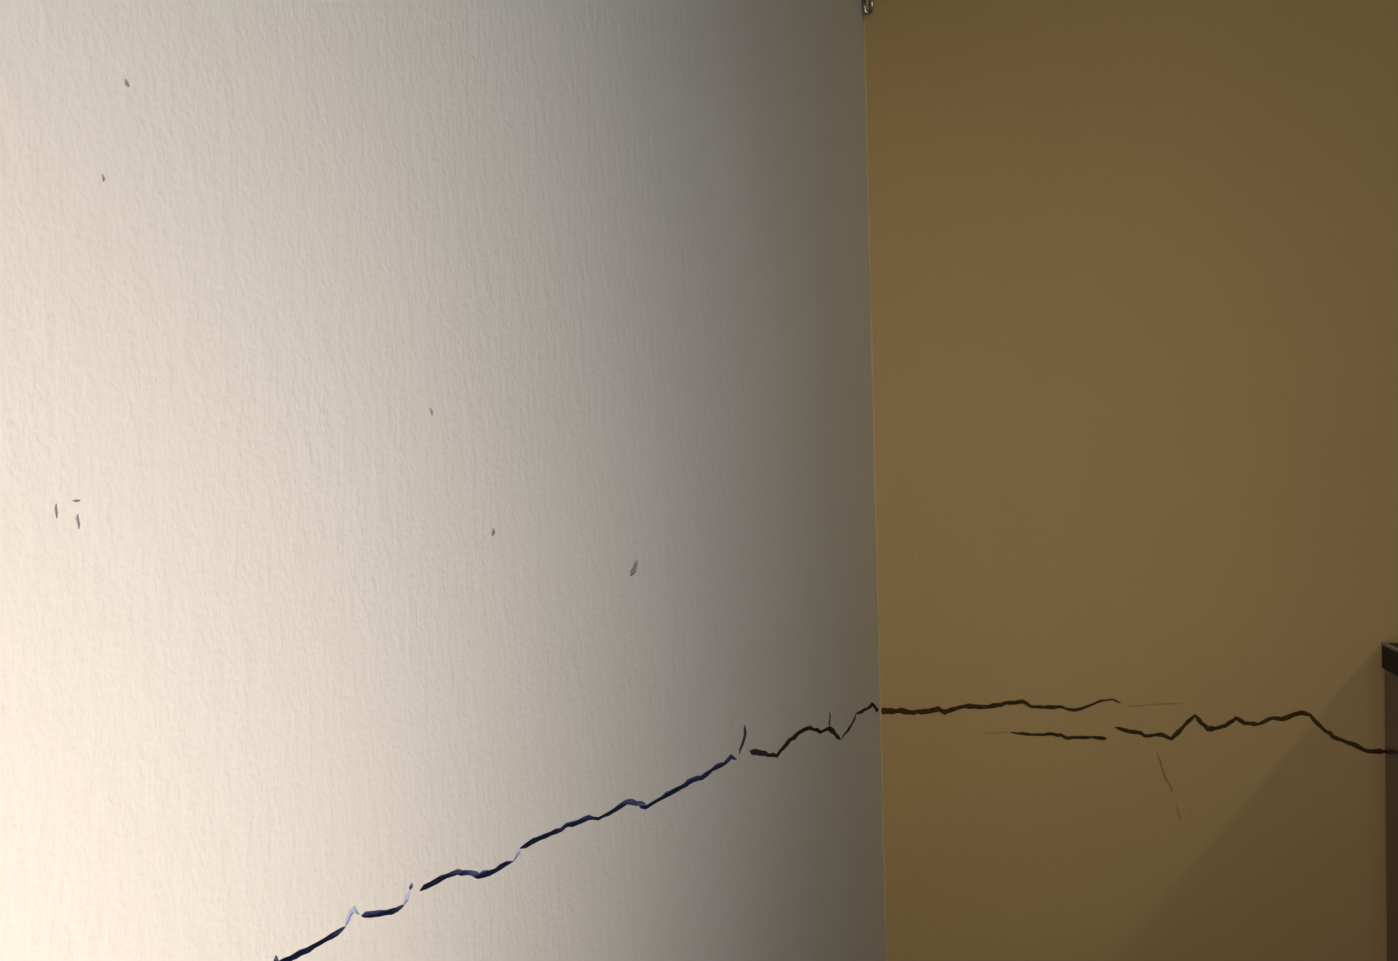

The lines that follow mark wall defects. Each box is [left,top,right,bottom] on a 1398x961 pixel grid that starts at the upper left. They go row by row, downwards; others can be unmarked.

crack [274,698,1385,961]